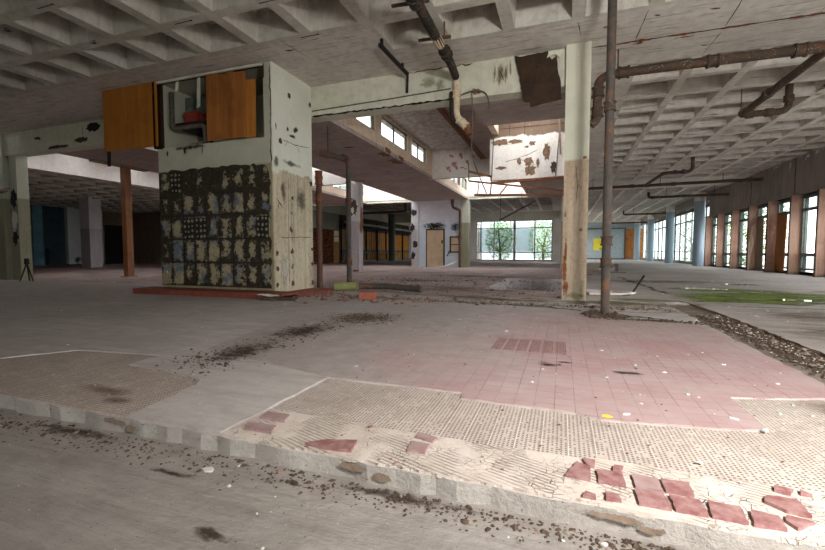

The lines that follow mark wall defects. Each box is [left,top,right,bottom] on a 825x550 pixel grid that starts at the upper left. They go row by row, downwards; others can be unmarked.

peeling [491,139,556,176]
spalling [340,462,391,483]
spalling [585,510,666,535]